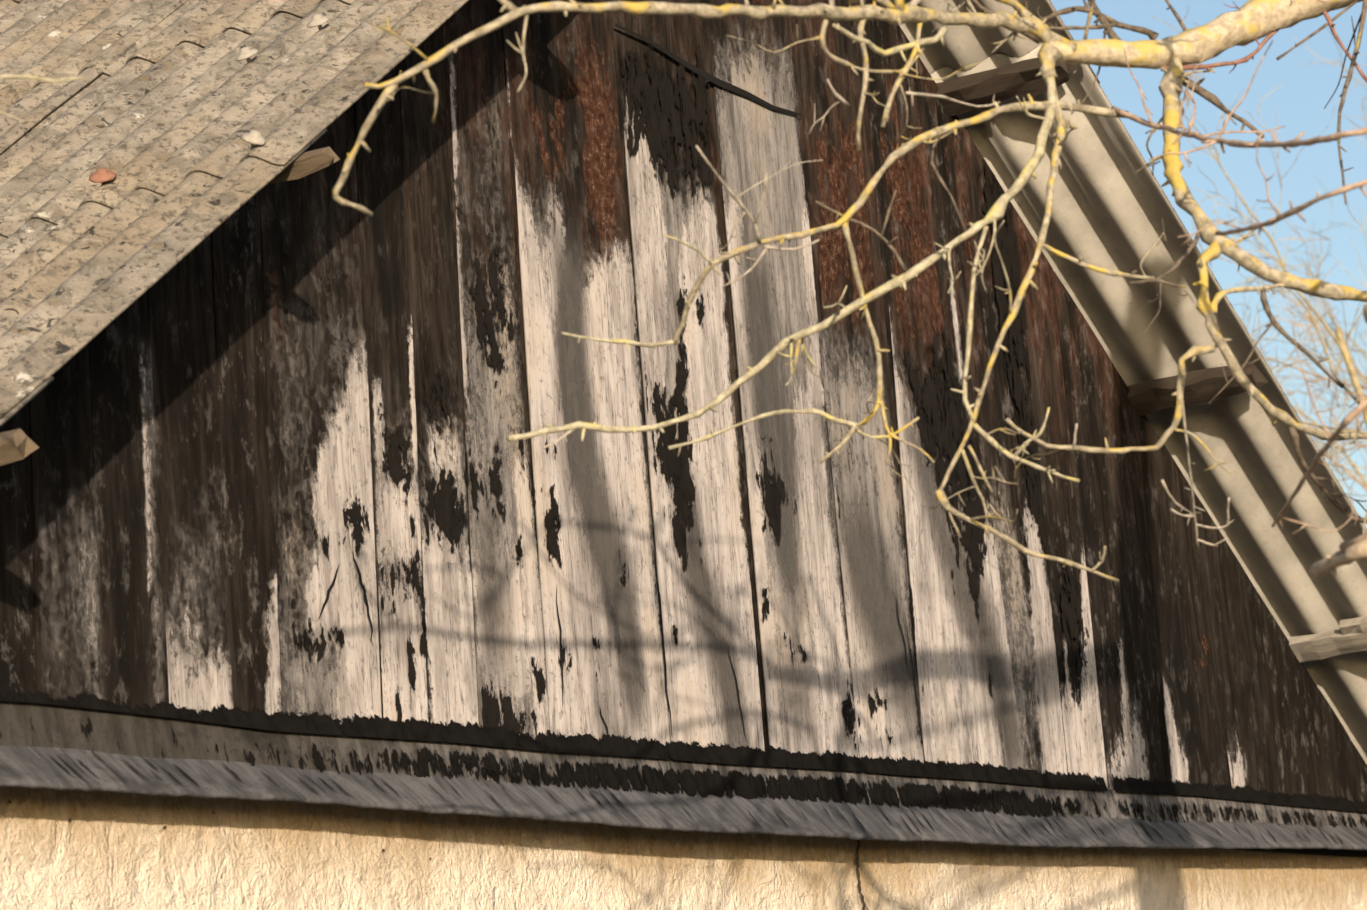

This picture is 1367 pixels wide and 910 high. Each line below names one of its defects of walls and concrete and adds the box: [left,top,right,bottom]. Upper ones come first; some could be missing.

peeling [1107,638,1367,813]
peeling [312,743,1107,819]
peeling [1115,798,1279,825]
peeling [1279,808,1322,827]
peeling [1328,813,1367,828]
crack [856,840,869,910]